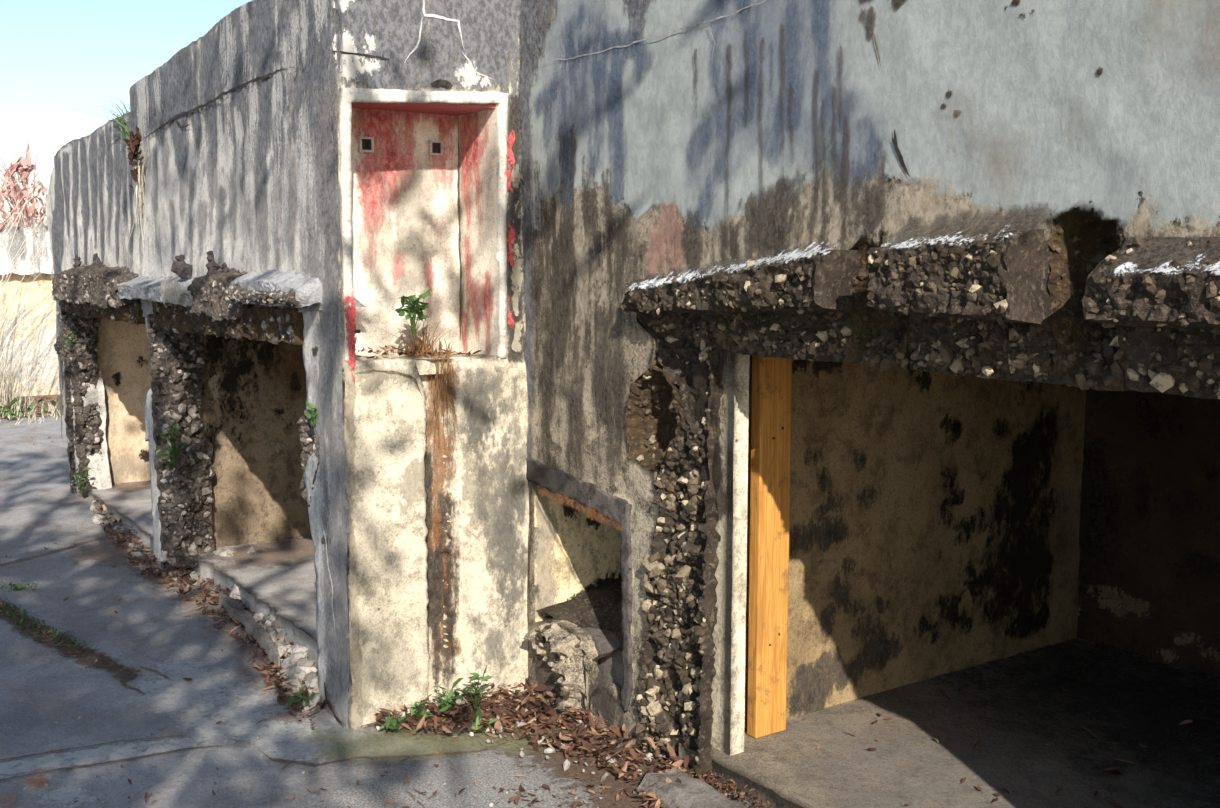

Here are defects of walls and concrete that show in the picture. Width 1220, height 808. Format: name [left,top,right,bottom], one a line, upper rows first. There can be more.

crack [330,0,492,79]
water stain [623,0,652,46]
crack [543,0,766,63]
peeling [860,0,875,40]
water stain [1,0,644,727]
corrosion [424,365,461,666]
spalling [533,495,581,711]
water stain [688,350,730,524]
water stain [790,449,876,553]
water stain [786,557,902,716]
spalling [619,199,1220,774]
water stain [914,381,1220,808]